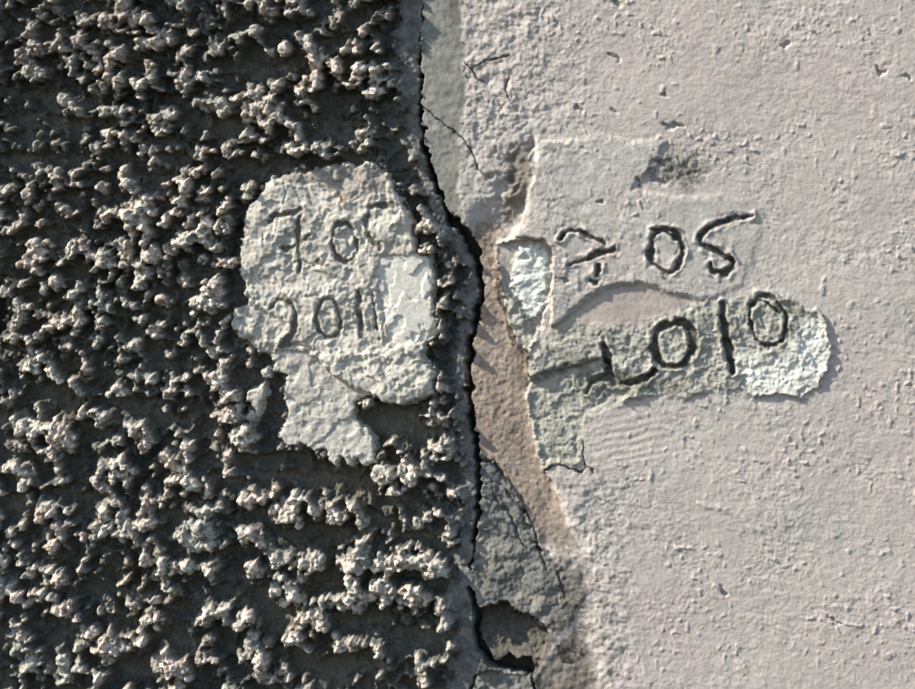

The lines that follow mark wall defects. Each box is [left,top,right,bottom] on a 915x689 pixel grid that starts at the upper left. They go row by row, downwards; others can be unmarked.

crack [420,54,542,564]
spalling [415,0,589,673]
crack [470,587,503,666]